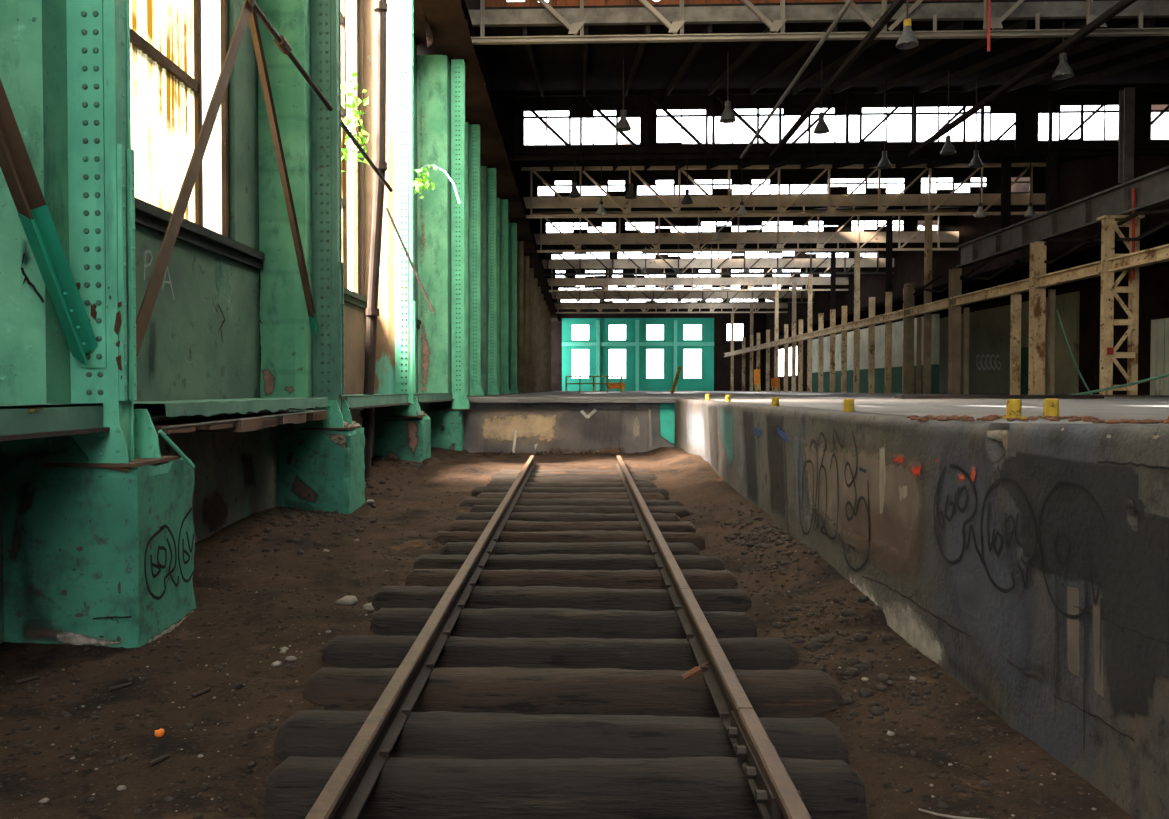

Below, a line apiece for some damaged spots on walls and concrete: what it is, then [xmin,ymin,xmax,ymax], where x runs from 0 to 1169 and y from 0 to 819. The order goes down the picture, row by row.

peeling [421,325,430,392]
peeling [407,422,418,455]
flaking render [26,628,121,645]